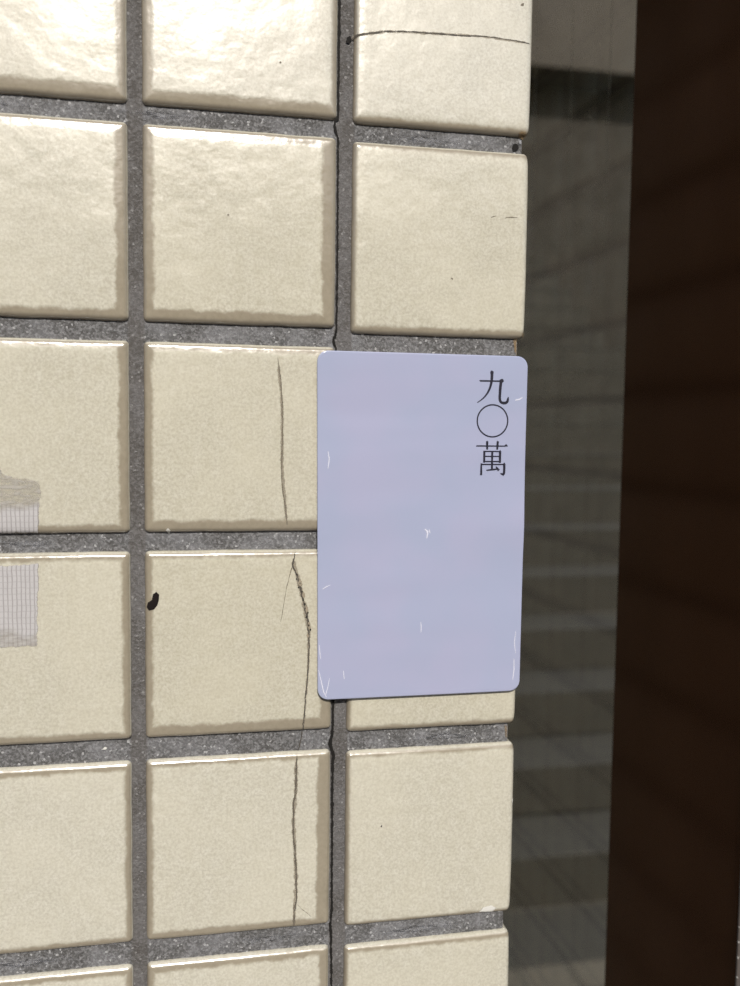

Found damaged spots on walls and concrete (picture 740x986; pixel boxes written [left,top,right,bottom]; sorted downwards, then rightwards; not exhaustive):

crack [346,30,529,44]
crack [278,361,287,521]
crack [280,553,311,926]